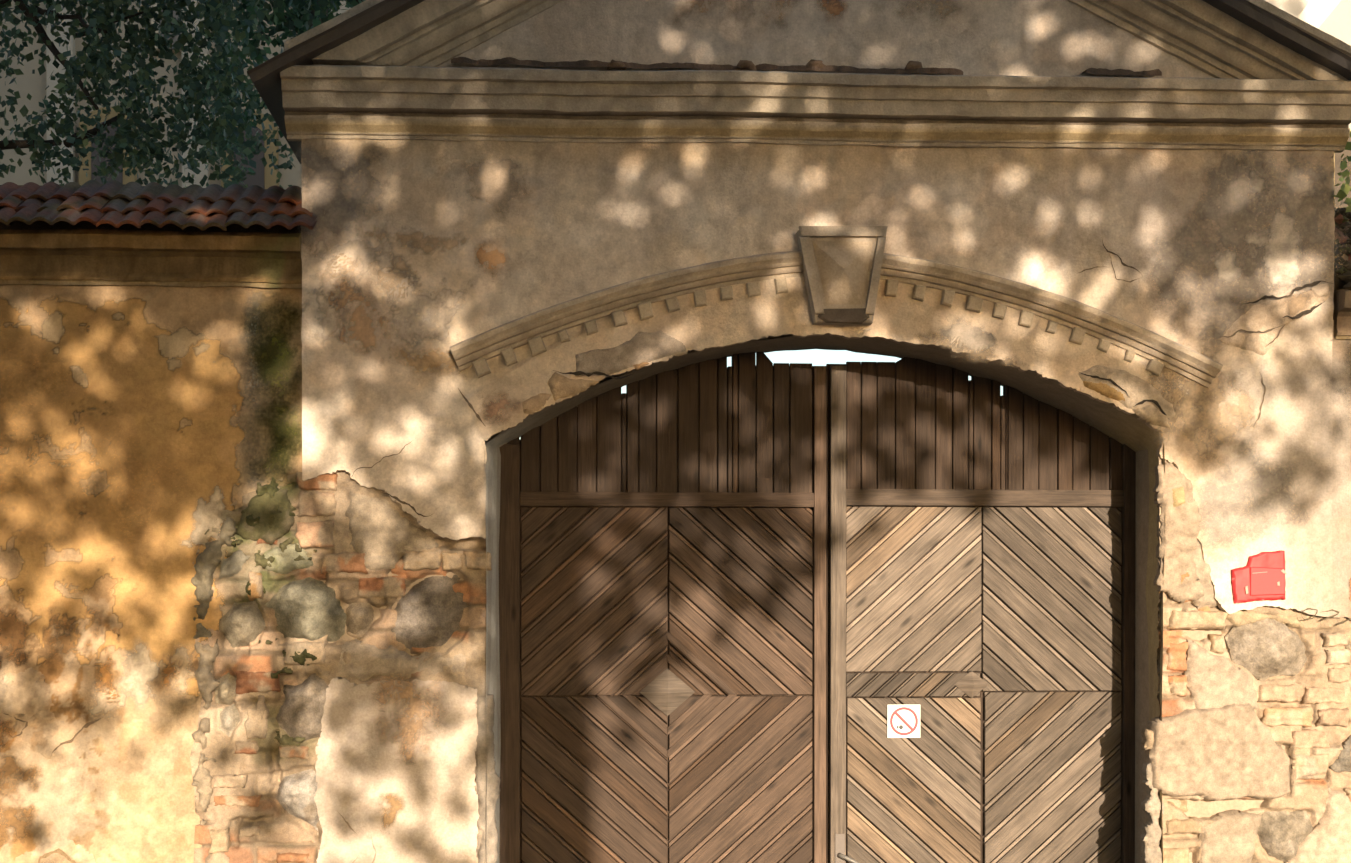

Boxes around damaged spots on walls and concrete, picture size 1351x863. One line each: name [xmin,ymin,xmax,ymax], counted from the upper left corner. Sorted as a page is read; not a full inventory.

flaking render [522,330,688,414]
flaking render [918,318,1017,365]
flaking render [1218,280,1333,355]
spalling [0,297,500,863]
spalling [1078,365,1351,863]